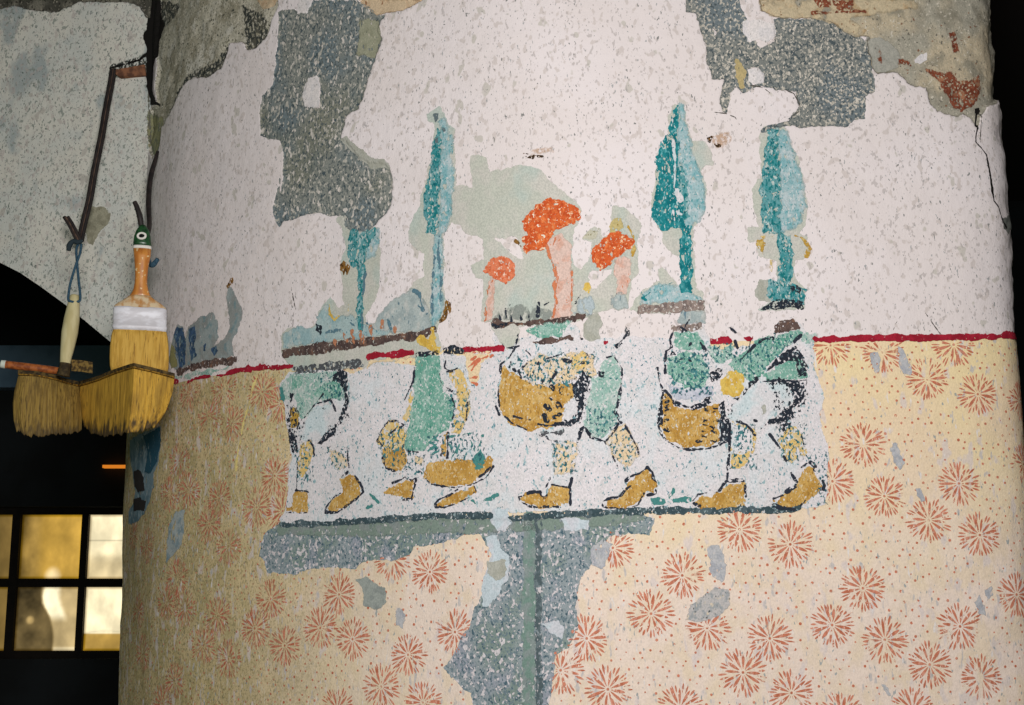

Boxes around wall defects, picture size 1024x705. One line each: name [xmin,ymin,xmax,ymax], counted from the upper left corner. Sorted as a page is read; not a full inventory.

peeling [0,0,714,371]
peeling [686,0,997,311]
crack [974,108,1012,233]
peeling [259,508,655,705]